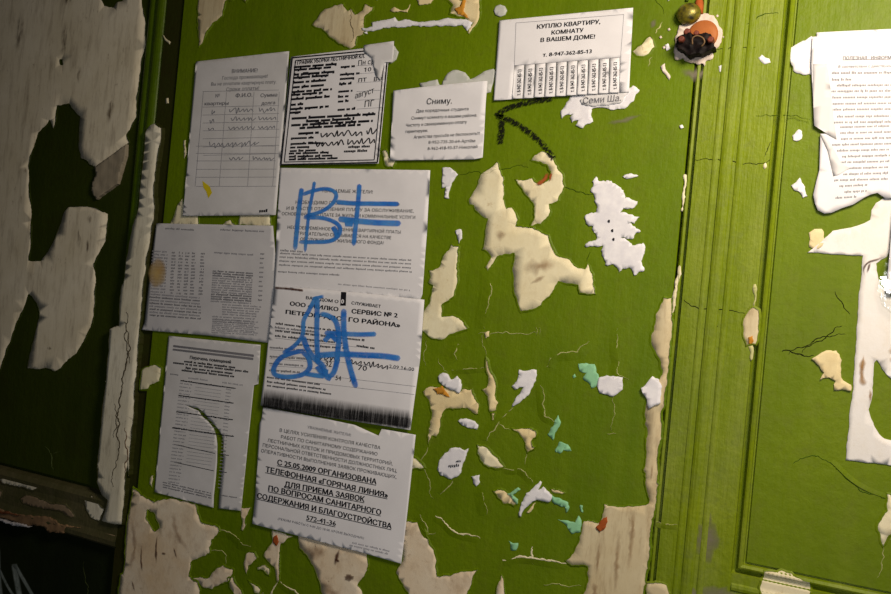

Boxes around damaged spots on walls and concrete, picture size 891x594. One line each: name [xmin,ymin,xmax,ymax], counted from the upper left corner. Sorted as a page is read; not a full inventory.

peeling [311,2,374,50]
peeling [444,0,482,35]
peeling [0,0,147,373]
peeling [467,149,597,314]
peeling [84,123,370,594]
peeling [422,243,469,341]
peeling [422,355,499,447]
peeling [564,265,681,594]
peeling [741,284,761,361]
crack [782,292,850,357]
crack [794,455,886,499]
peeling [396,519,479,594]